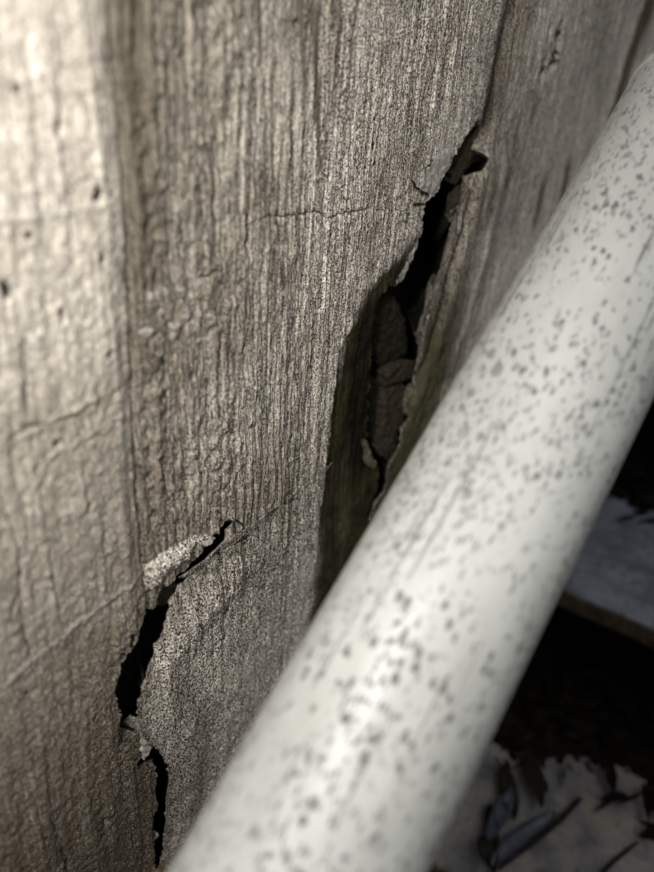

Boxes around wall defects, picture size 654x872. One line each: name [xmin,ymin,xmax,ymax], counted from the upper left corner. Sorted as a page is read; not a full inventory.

leakage [335,300,378,561]
leakage [371,305,457,522]
crack [361,119,485,525]
spalling [142,534,215,589]
crack [114,519,250,869]